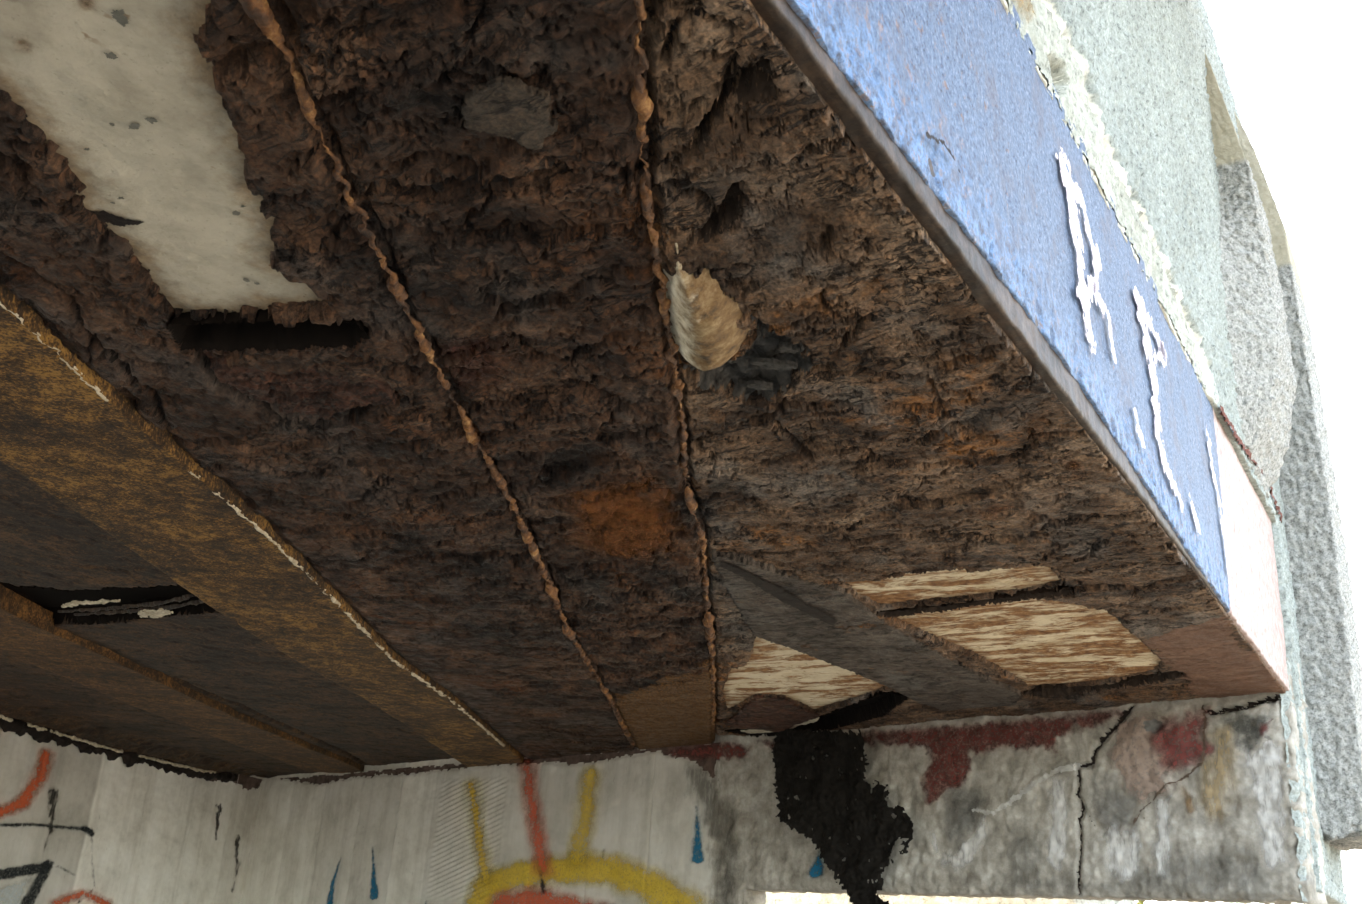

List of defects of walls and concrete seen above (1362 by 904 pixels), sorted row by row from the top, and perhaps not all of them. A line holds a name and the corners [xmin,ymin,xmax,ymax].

crack [665,7,734,54]
spalling [0,0,370,352]
crack [391,163,573,196]
peeling [0,302,109,402]
corrosion [238,0,635,747]
corrosion [630,0,914,904]
peeling [0,582,219,625]
peeling [212,492,505,746]
spalling [845,565,1184,697]
crack [1133,706,1208,824]